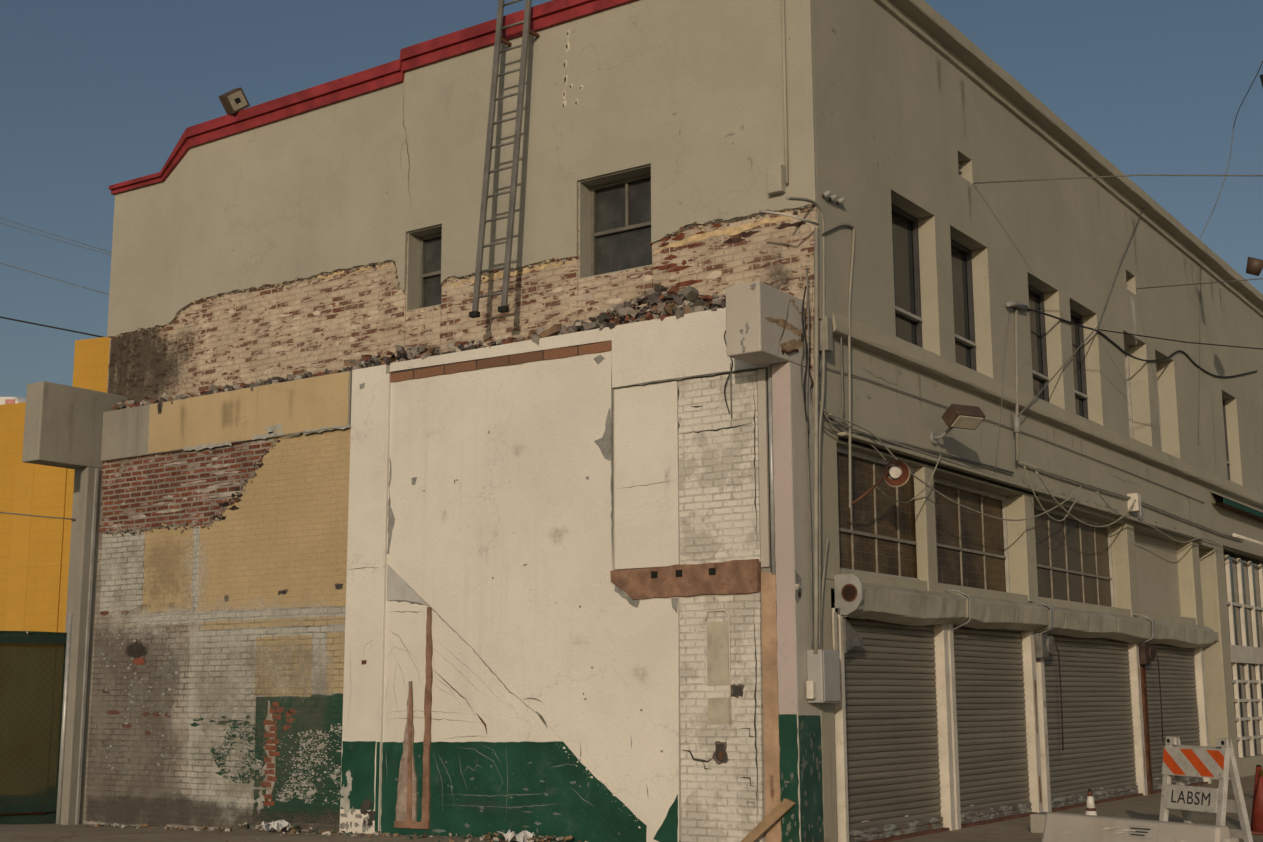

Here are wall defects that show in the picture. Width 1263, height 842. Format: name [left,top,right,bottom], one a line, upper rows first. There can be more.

crack [400,92,411,204]
flaking render [107,205,817,414]
peeling [99,423,284,536]
flaking render [594,408,613,461]
peeling [190,700,379,832]
peeling [781,721,823,842]